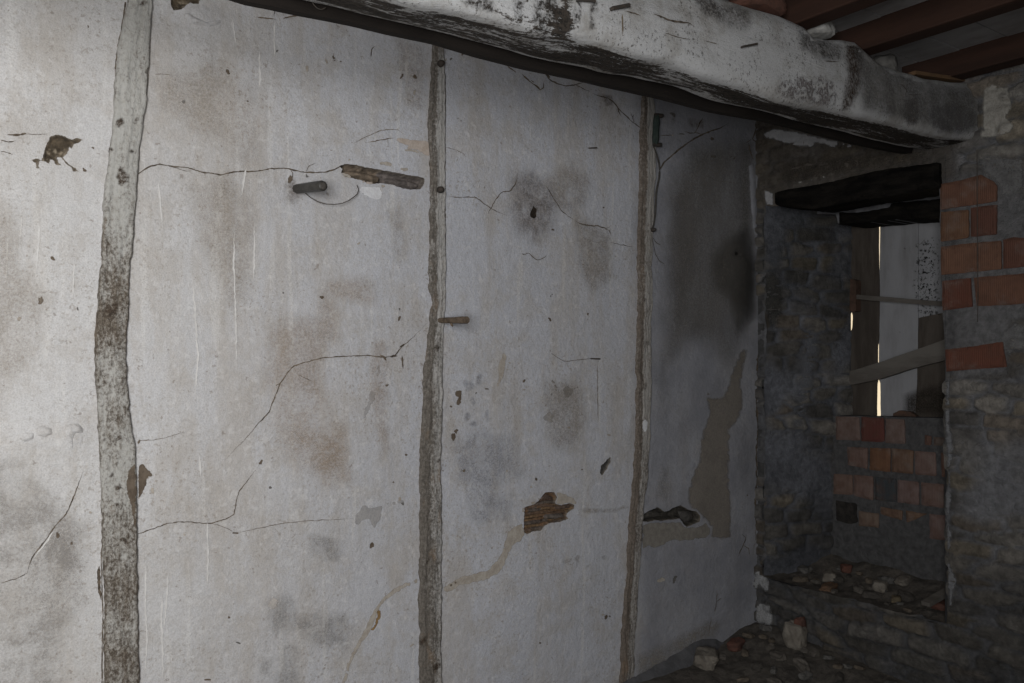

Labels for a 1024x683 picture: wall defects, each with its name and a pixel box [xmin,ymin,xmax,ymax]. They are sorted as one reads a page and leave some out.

crack [147,17,169,91]
flaking render [32,135,94,172]
crack [133,147,340,242]
crack [547,188,632,247]
crack [224,332,418,461]
crack [3,478,81,583]
crack [138,467,340,534]
flaking render [444,478,576,592]
flaking render [642,505,710,548]